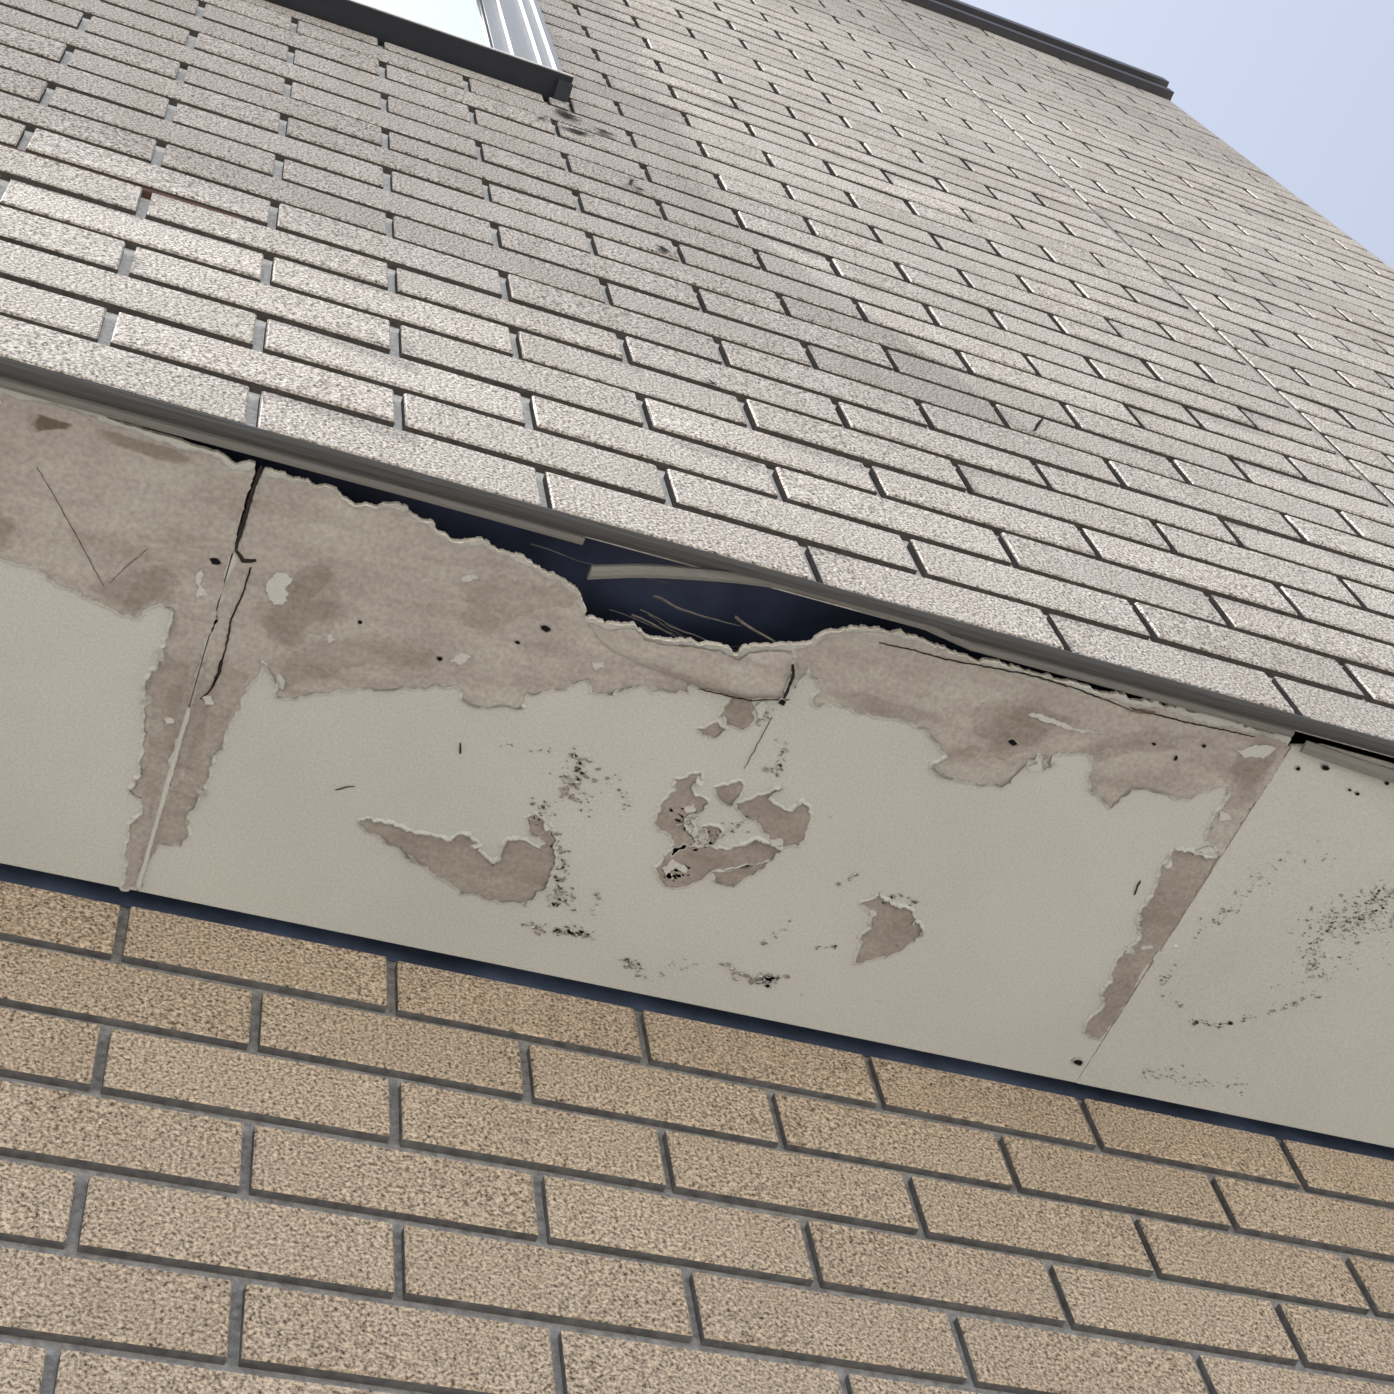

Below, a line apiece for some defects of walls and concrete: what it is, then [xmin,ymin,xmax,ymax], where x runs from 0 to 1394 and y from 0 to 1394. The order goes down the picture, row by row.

crack [200,465,263,699]
peeling [0,393,1394,1041]